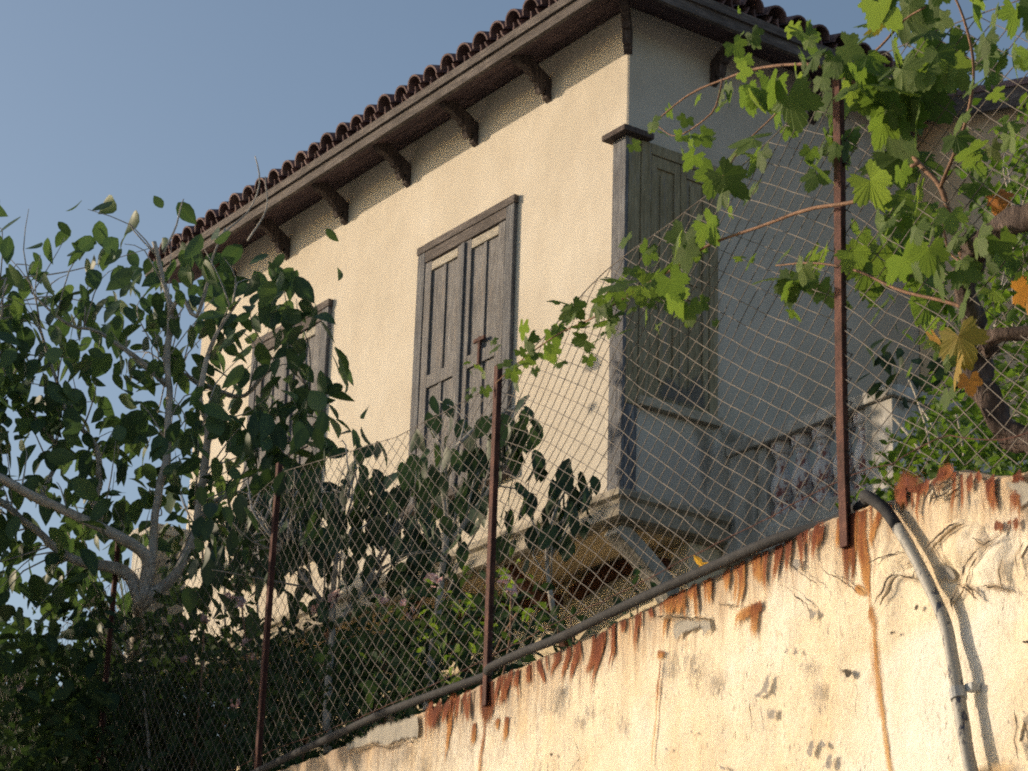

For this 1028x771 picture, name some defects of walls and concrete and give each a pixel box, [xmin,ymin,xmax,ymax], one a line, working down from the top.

corrosion [425,464,1025,771]
crack [784,476,1028,623]